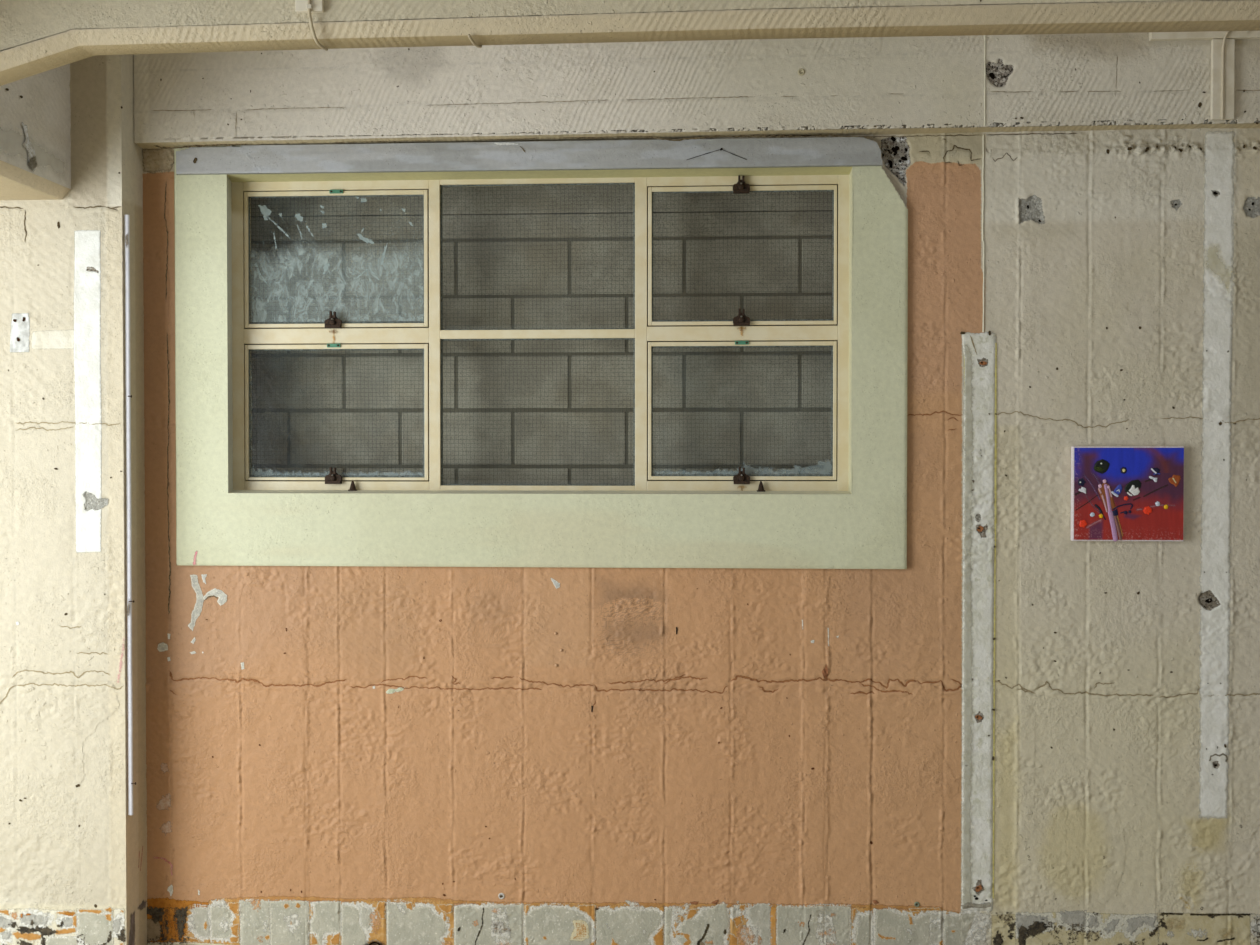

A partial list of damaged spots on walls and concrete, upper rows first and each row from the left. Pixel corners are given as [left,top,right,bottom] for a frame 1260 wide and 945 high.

spalling [986,59,1013,87]
spalling [874,125,911,186]
spalling [1019,195,1045,224]
peeling [1175,120,1260,818]
peeling [188,574,227,654]
crack [0,625,124,704]
crack [170,672,962,707]
crack [995,681,1260,698]
peeling [0,909,22,945]
peeling [45,904,125,945]
peeling [183,881,992,945]
peeling [1078,907,1251,945]